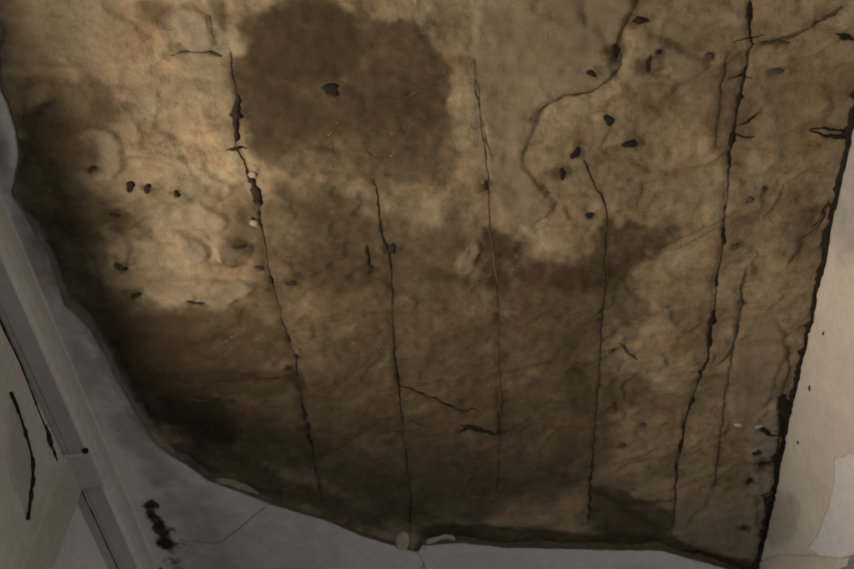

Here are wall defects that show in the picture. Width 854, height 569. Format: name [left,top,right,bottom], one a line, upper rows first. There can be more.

spalling [172,8,208,52]
water stain [233,0,450,153]
spalling [0,21,395,546]
crack [170,51,322,501]
water stain [18,116,758,569]
crack [364,60,507,531]
crack [673,0,854,569]
spalling [406,536,739,569]
spalling [676,521,698,545]
spalling [691,488,761,562]
peeling [807,453,854,558]